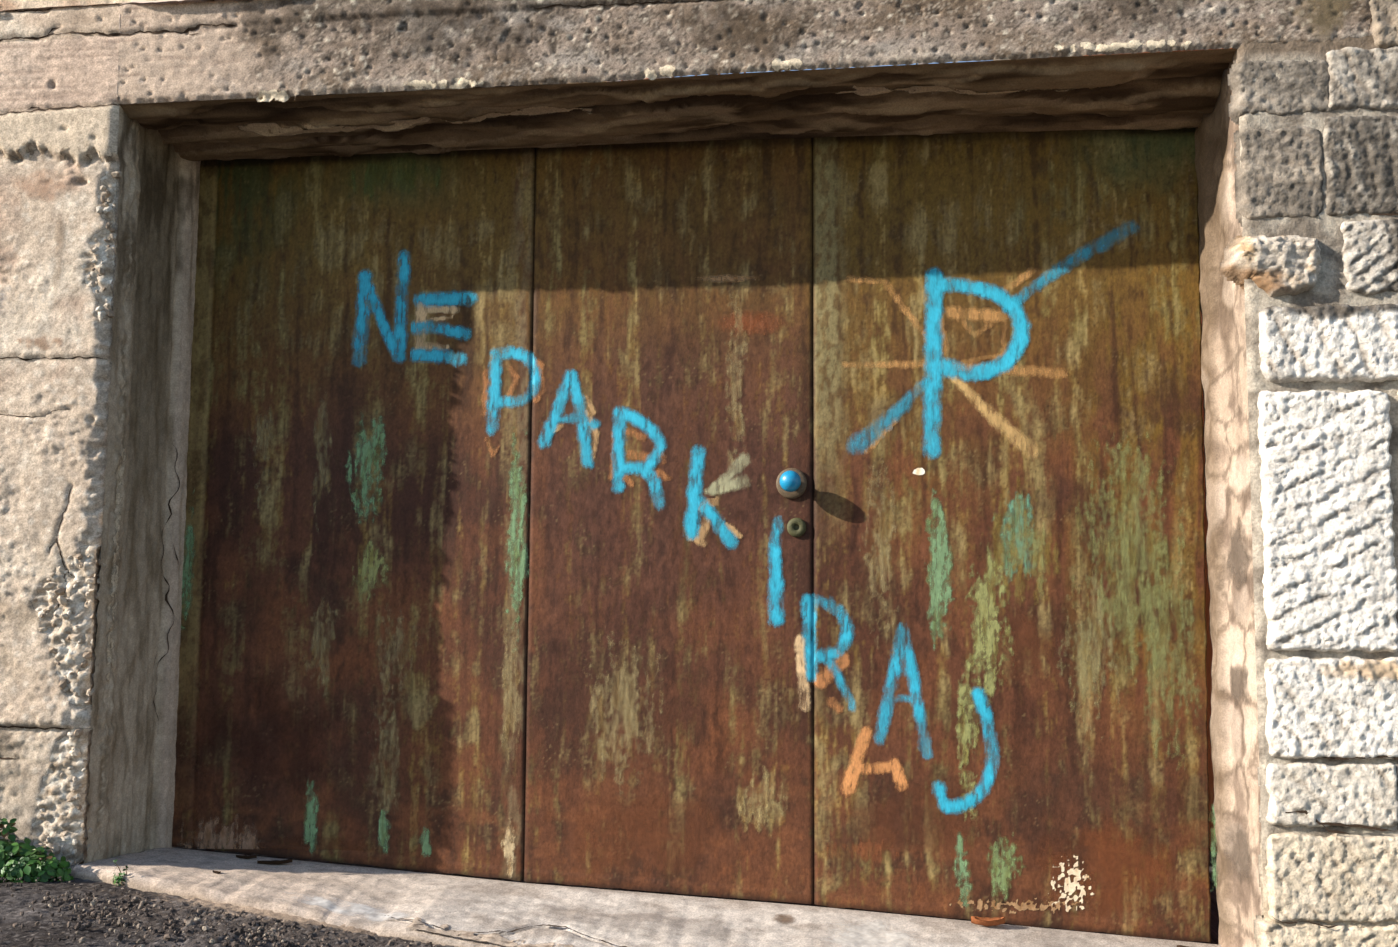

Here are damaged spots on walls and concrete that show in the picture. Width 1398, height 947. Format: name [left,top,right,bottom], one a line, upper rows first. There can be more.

crack [0,2,235,41]
crack [48,484,81,615]